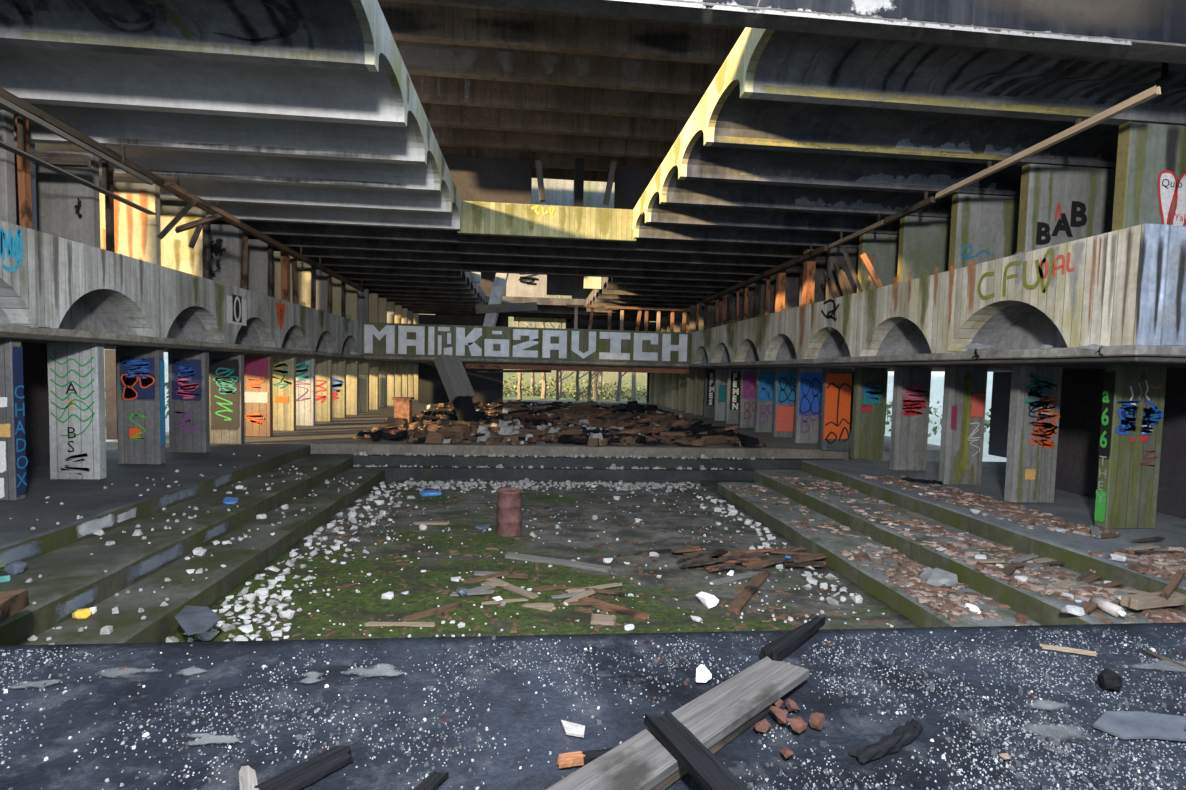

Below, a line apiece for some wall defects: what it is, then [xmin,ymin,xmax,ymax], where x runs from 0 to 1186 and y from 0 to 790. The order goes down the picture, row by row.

peeling [614,0,1131,45]
peeling [961,55,1186,105]
water stain [1167,128,1186,175]
water stain [54,238,71,287]
water stain [1071,172,1096,308]
water stain [1123,233,1186,334]